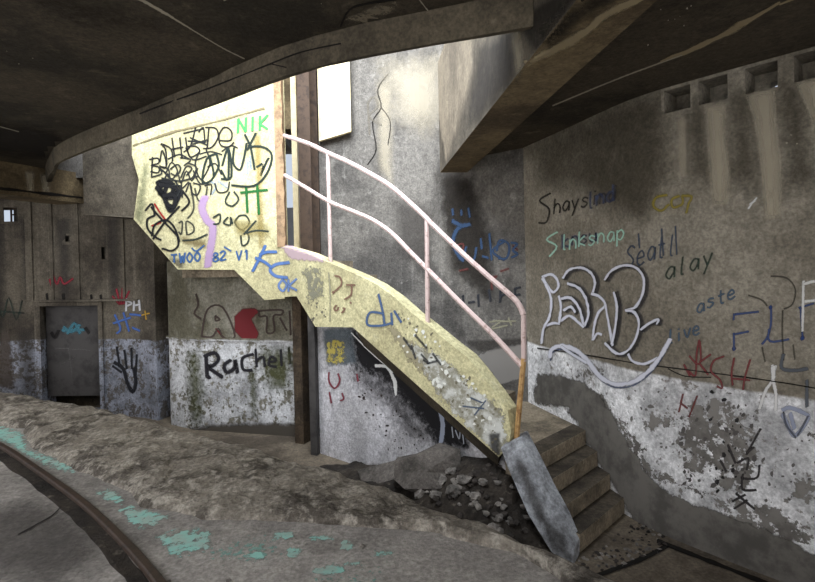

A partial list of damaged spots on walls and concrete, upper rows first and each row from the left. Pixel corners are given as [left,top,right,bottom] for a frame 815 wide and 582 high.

crack [367,74,391,165]
leakage [542,108,657,202]
leakage [187,348,295,437]
spalling [0,313,616,582]
peeling [470,339,815,582]